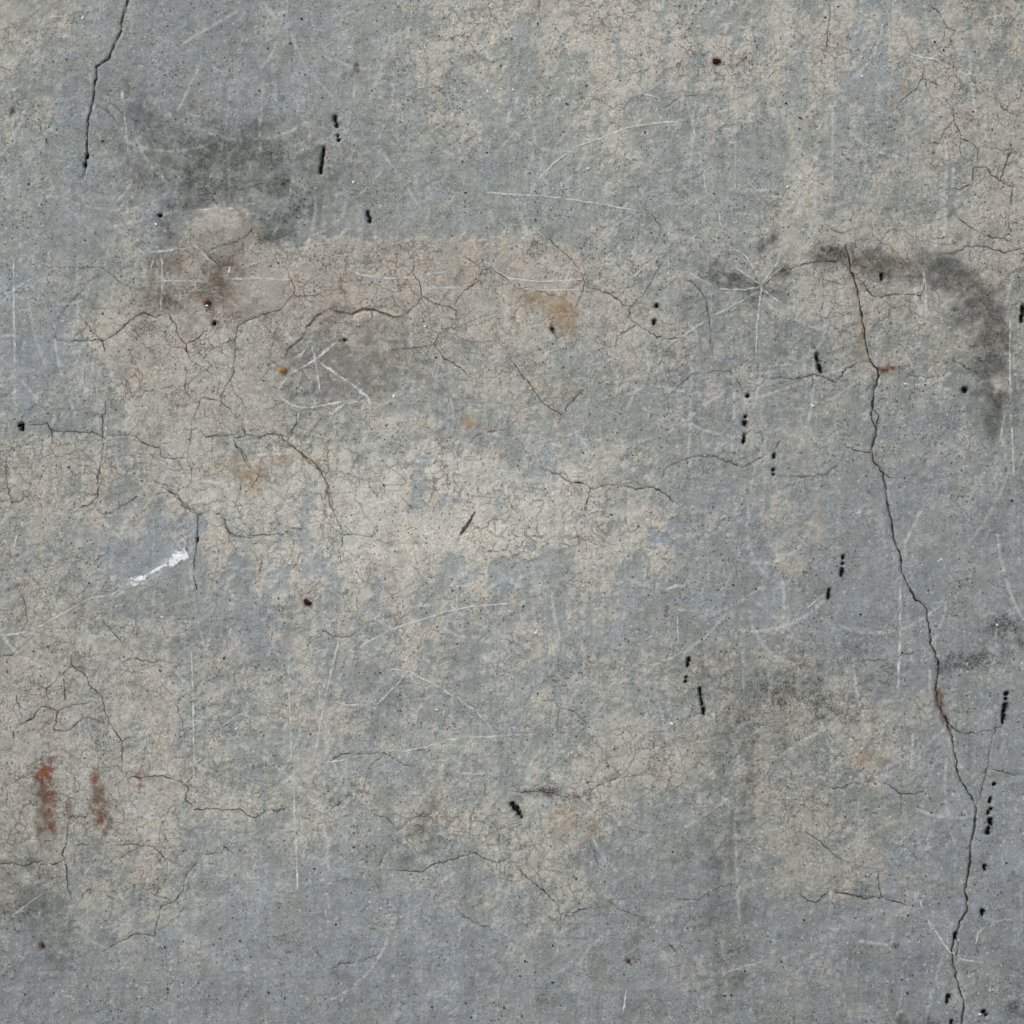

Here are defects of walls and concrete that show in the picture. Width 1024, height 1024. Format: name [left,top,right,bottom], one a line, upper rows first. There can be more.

crack [85,0,129,170]
crack [402,258,507,373]
crack [549,239,679,339]
crack [53,295,332,506]
crack [31,409,137,514]
crack [163,484,296,590]
crack [550,471,673,509]
crack [767,231,1013,1022]
crack [13,662,283,818]
rust [36,766,56,832]
crack [1,843,110,897]
crack [377,821,500,887]